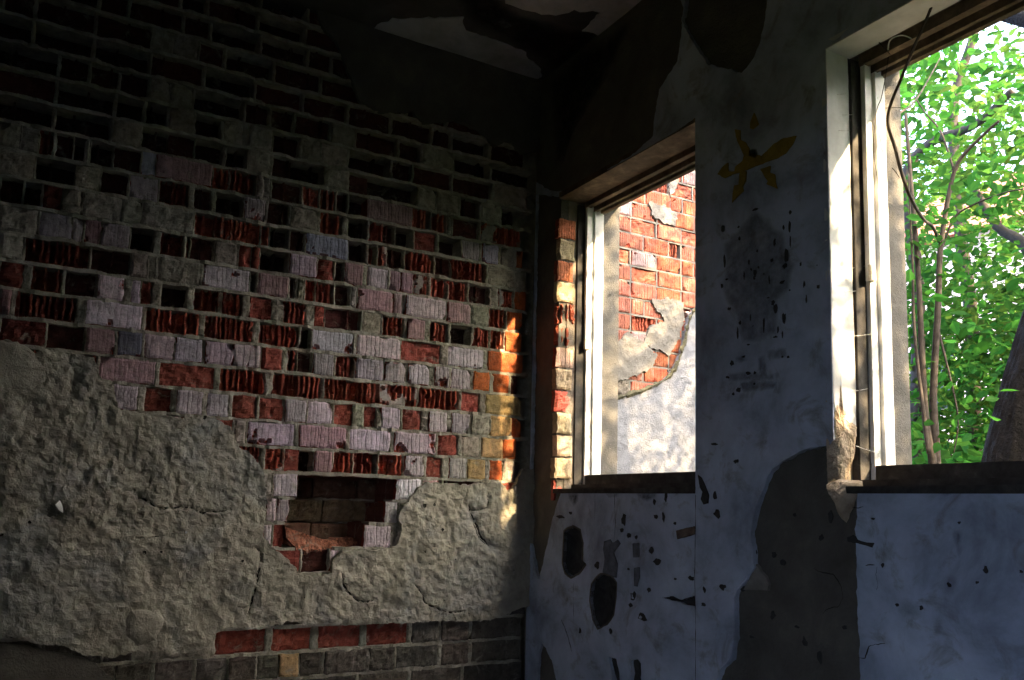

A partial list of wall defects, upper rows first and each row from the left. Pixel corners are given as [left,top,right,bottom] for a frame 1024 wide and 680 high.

flaking render [0,0,768,634]
flaking render [0,607,525,680]
flaking render [715,386,874,680]